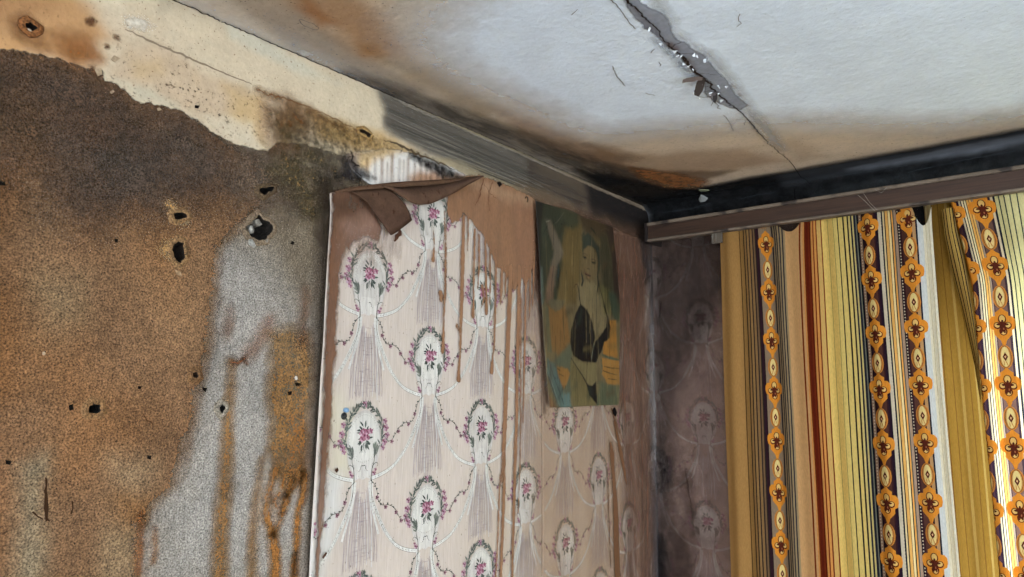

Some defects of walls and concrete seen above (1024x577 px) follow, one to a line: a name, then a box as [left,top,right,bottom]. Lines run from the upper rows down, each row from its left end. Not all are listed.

spalling [161,203,192,276]
leakage [0,49,381,577]
rust [212,342,257,577]
spalling [240,183,278,248]
rust [249,328,312,577]
peeling [0,0,649,238]
leakage [391,113,552,577]
leakage [179,0,1024,222]
crack [611,0,810,199]